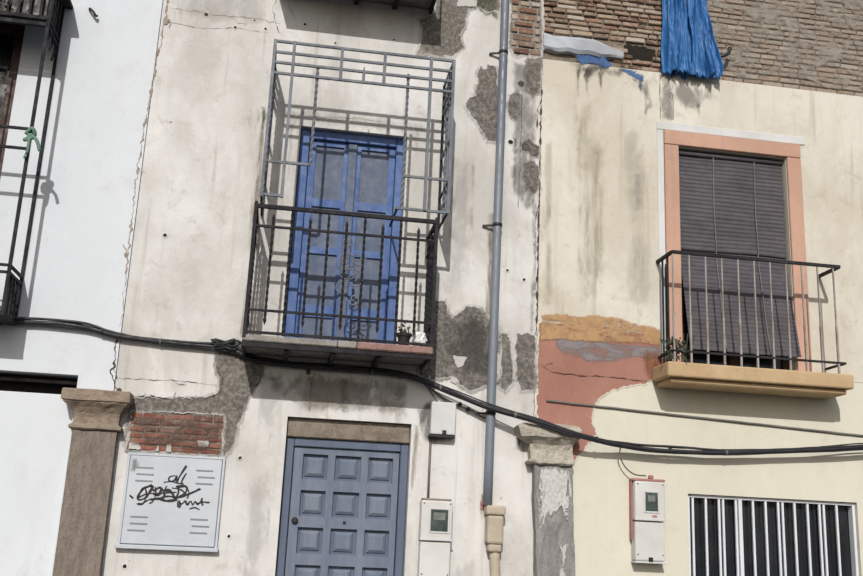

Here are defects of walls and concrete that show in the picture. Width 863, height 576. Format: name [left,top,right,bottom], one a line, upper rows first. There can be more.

crack [121,0,294,318]
spalling [415,0,545,197]
water stain [577,55,644,88]
crack [110,339,224,400]
spalling [121,340,266,461]
peeling [416,297,667,532]